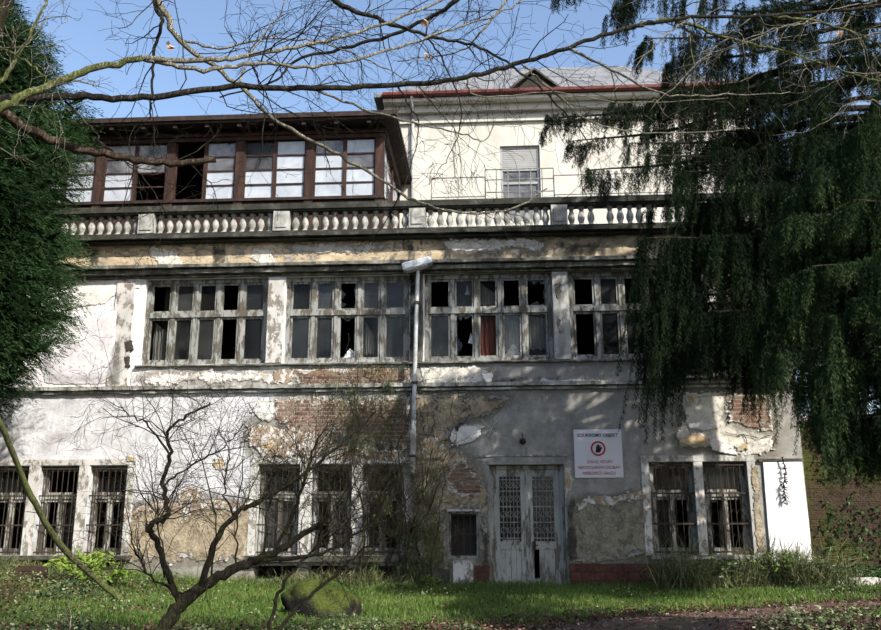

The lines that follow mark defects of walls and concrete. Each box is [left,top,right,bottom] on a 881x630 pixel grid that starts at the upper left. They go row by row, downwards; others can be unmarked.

peeling [250,246,275,263]
peeling [444,238,544,253]
flaking render [676,387,776,455]
flaking render [143,364,509,569]
flaking render [568,491,646,563]
flaking render [751,466,765,552]